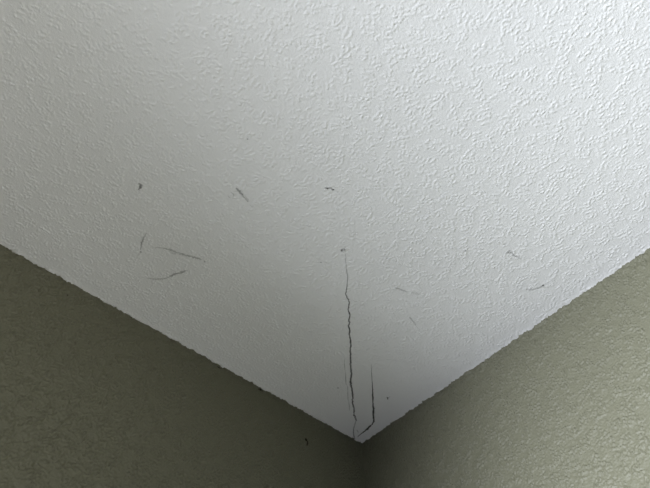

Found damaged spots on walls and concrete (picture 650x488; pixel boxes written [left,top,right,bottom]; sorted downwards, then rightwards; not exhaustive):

crack [345,279,375,439]